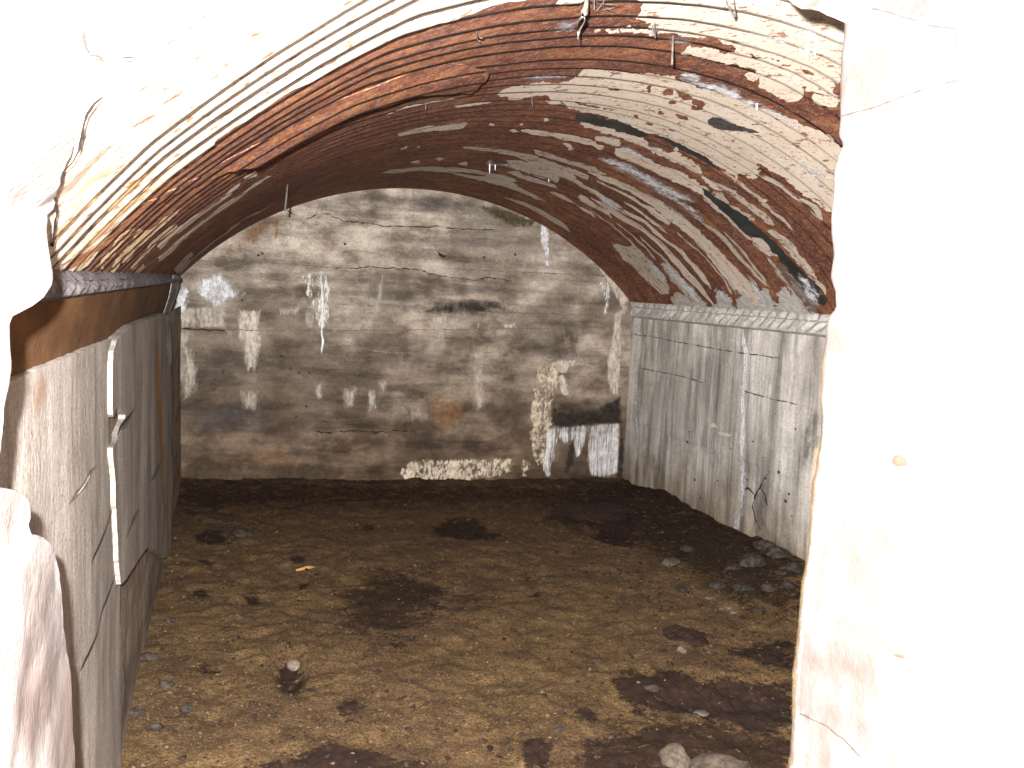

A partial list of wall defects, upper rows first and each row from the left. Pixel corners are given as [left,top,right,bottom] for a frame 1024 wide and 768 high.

crack [51,9,214,247]
peeling [0,0,525,274]
corrosion [574,85,720,170]
peeling [594,0,844,107]
corrosion [780,91,838,116]
peeling [382,69,841,314]
corrosion [702,162,829,312]
leakage [176,275,236,319]
leakage [238,310,261,369]
leakage [281,271,331,353]
leakage [520,268,638,479]
crack [744,475,767,529]